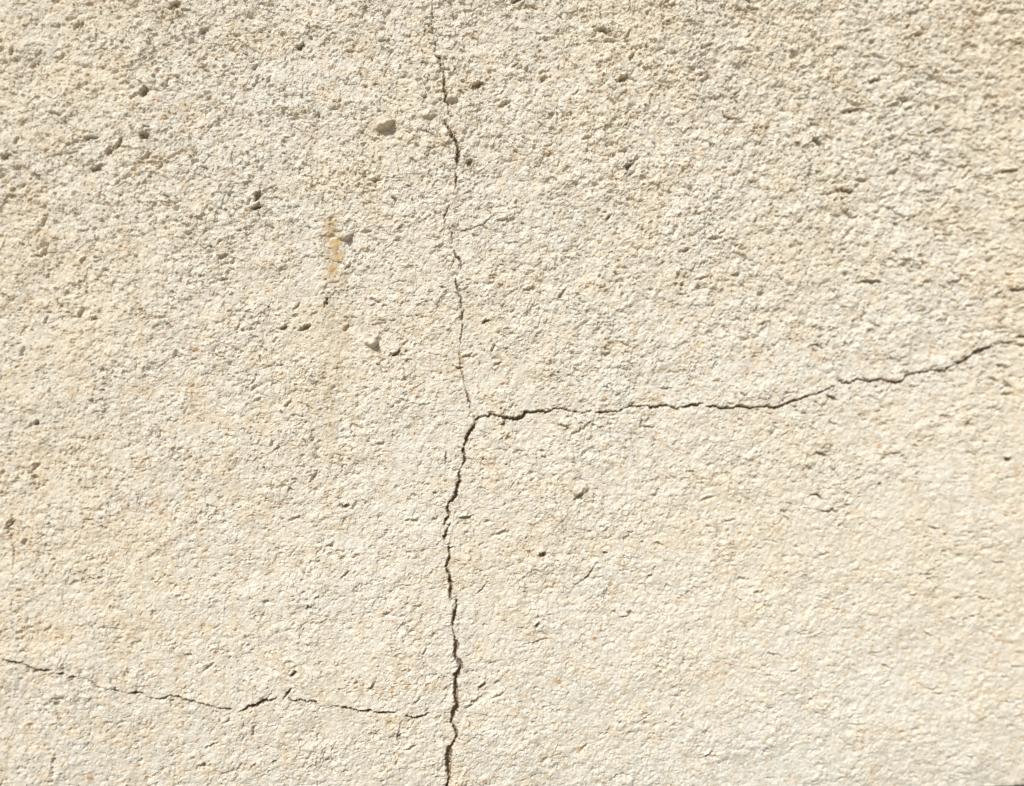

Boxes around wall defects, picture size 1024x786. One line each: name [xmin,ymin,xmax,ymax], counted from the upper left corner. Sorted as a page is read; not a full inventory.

crack [426,57,486,339]
crack [6,335,1024,786]